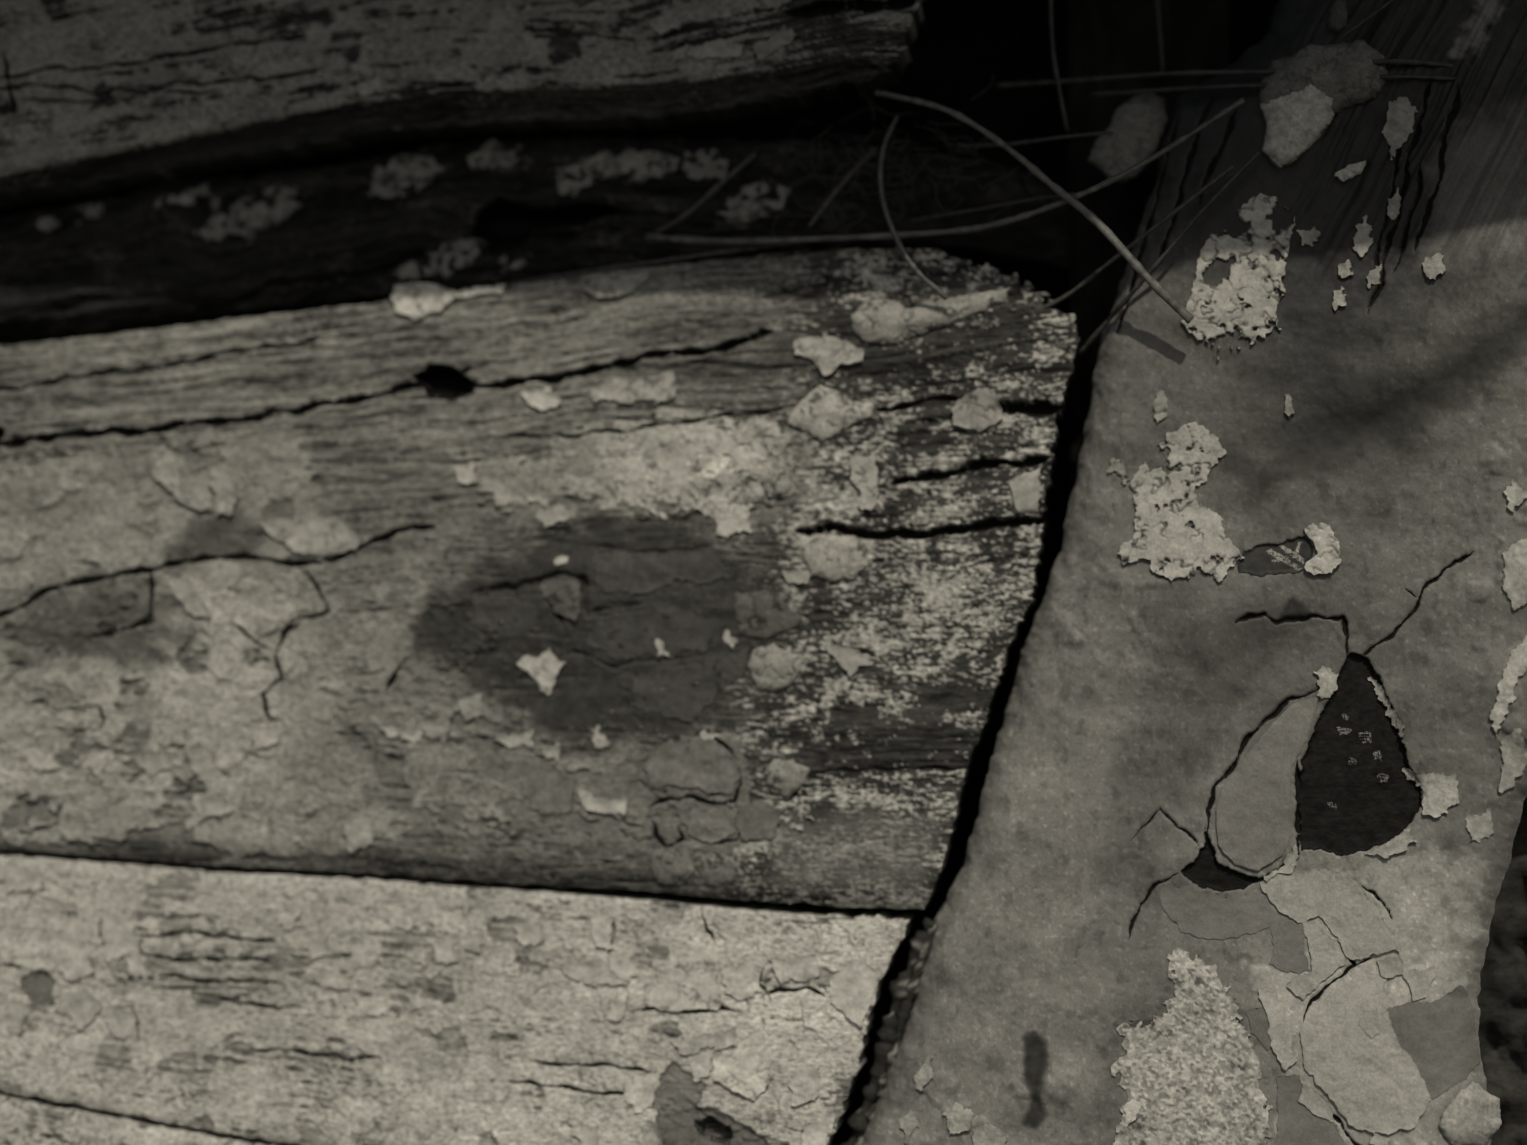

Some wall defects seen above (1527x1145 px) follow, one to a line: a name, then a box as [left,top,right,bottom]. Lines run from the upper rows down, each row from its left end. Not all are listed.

peeling [390,238,531,320]
peeling [1181,193,1321,361]
crack [0,330,797,448]
peeling [1106,390,1342,582]
crack [0,525,435,727]
leakage [416,514,781,750]
peeling [471,419,814,843]
crack [1234,551,1474,659]
crack [1129,688,1320,939]
peeling [1111,653,1494,1145]
crack [1303,958,1372,1021]
peeling [622,1027,835,1145]